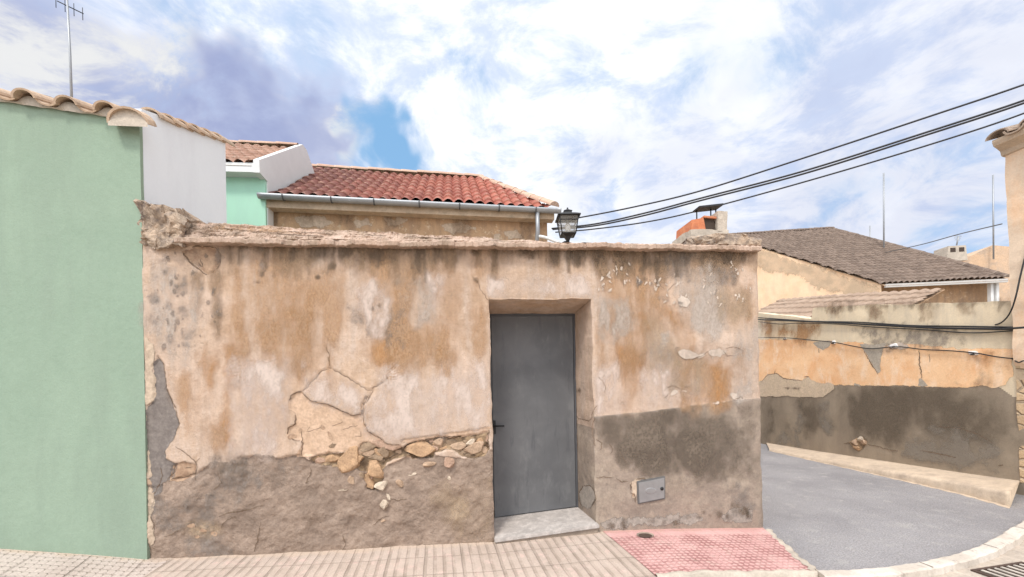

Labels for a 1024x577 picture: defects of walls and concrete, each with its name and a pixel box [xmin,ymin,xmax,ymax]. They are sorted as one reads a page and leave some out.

damp [476,249,504,295]
peeling [598,262,690,307]
damp [545,249,748,337]
peeling [144,337,179,545]
crack [303,347,388,414]
damp [230,246,490,438]
flaking render [287,392,490,522]
damp [596,365,737,477]
peeling [675,347,743,360]
peeling [759,372,834,398]
peeling [860,343,886,374]
damp [849,387,992,442]